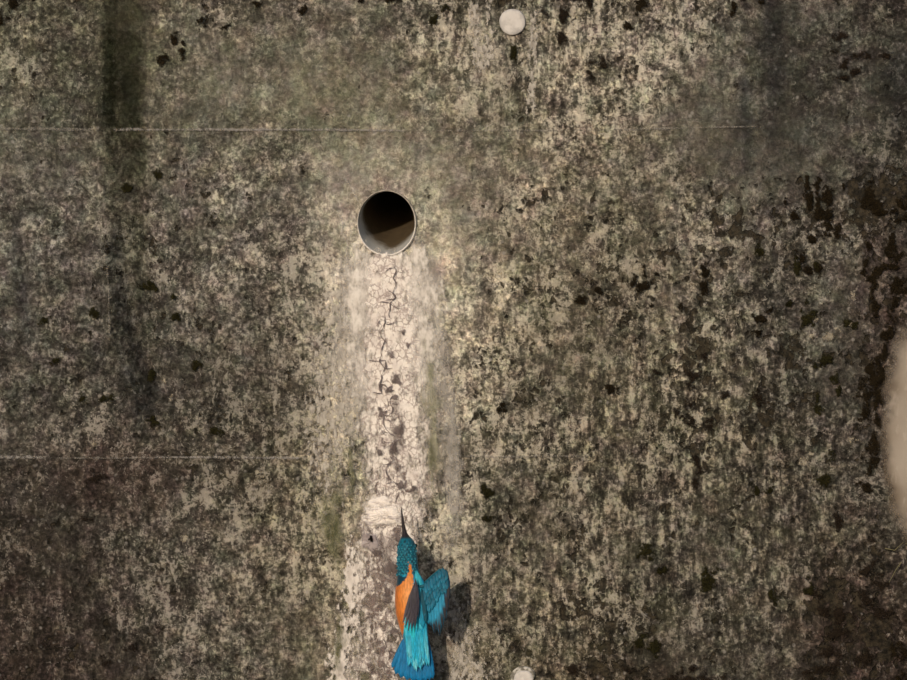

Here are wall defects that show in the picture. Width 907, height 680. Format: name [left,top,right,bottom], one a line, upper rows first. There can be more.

efflorescence [468,0,496,73]
efflorescence [526,11,537,114]
crack [370,267,403,485]
damp [304,242,453,680]
damp [443,592,493,680]